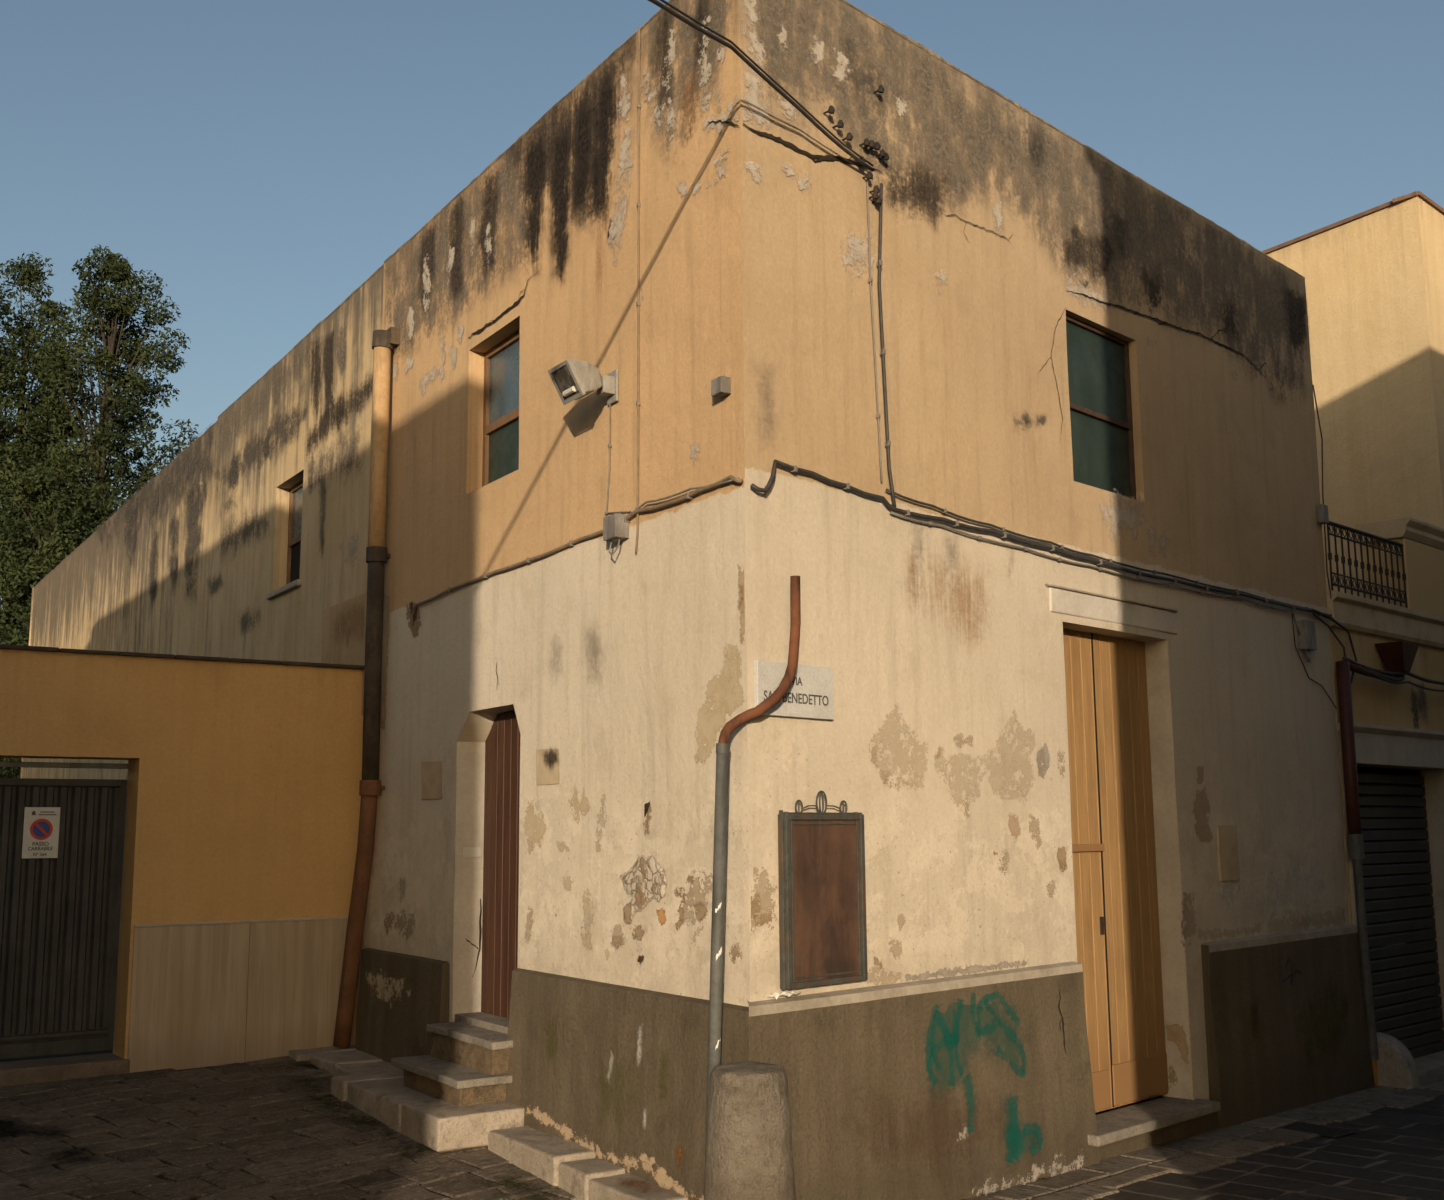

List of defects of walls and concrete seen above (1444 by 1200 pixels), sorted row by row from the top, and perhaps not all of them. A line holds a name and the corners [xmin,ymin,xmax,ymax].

leakage [387,0,731,350]
peeling [607,29,676,266]
leakage [758,0,1306,397]
leakage [97,330,373,599]
peeling [694,565,745,763]
peeling [936,733,973,758]
peeling [1036,744,1065,778]
peeling [563,856,713,965]
peeling [993,813,1042,875]
peeling [1046,846,1067,897]
peeling [365,970,411,1008]
spalling [526,1106,704,1200]